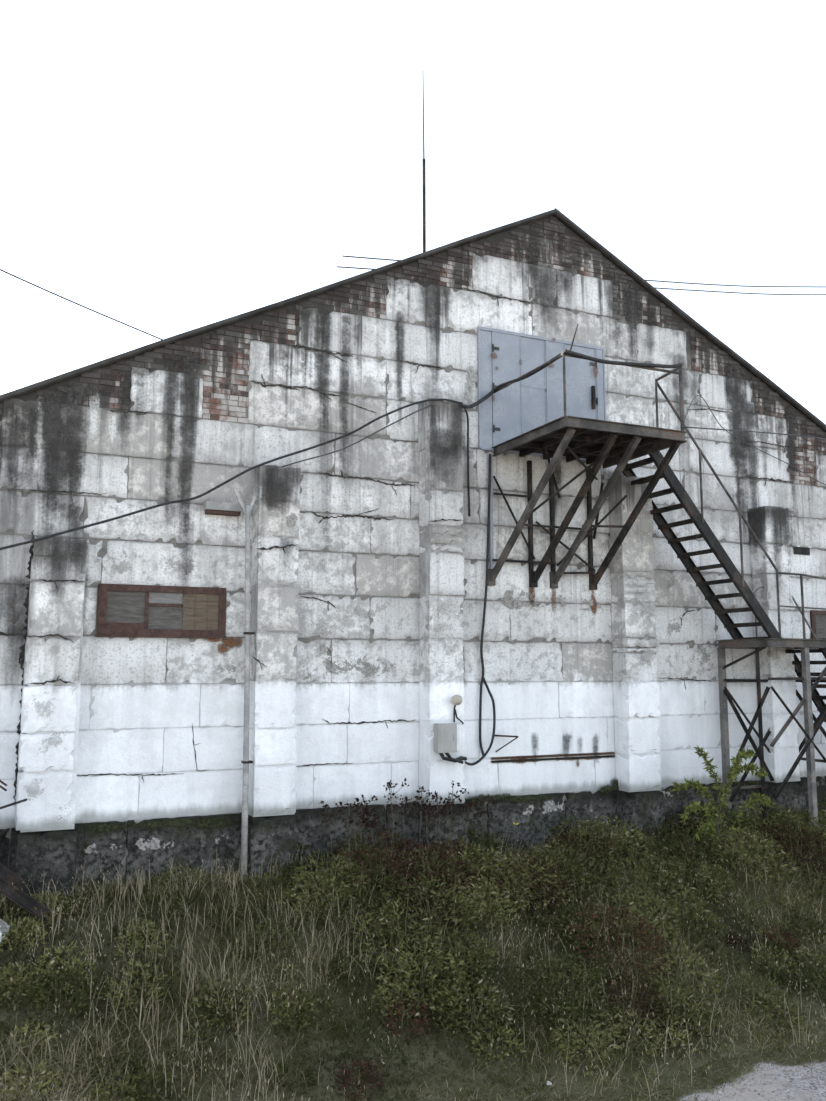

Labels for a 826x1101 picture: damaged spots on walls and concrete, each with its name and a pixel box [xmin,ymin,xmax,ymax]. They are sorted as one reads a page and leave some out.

leakage [421,282,441,330]
leakage [119,373,131,429]
leakage [317,311,351,459]
leakage [396,313,404,408]
leakage [0,385,91,526]
leakage [163,353,200,531]
leakage [262,466,298,508]
leakage [430,404,463,482]
leakage [726,366,799,553]
leakage [46,539,87,592]
rust [207,637,242,654]